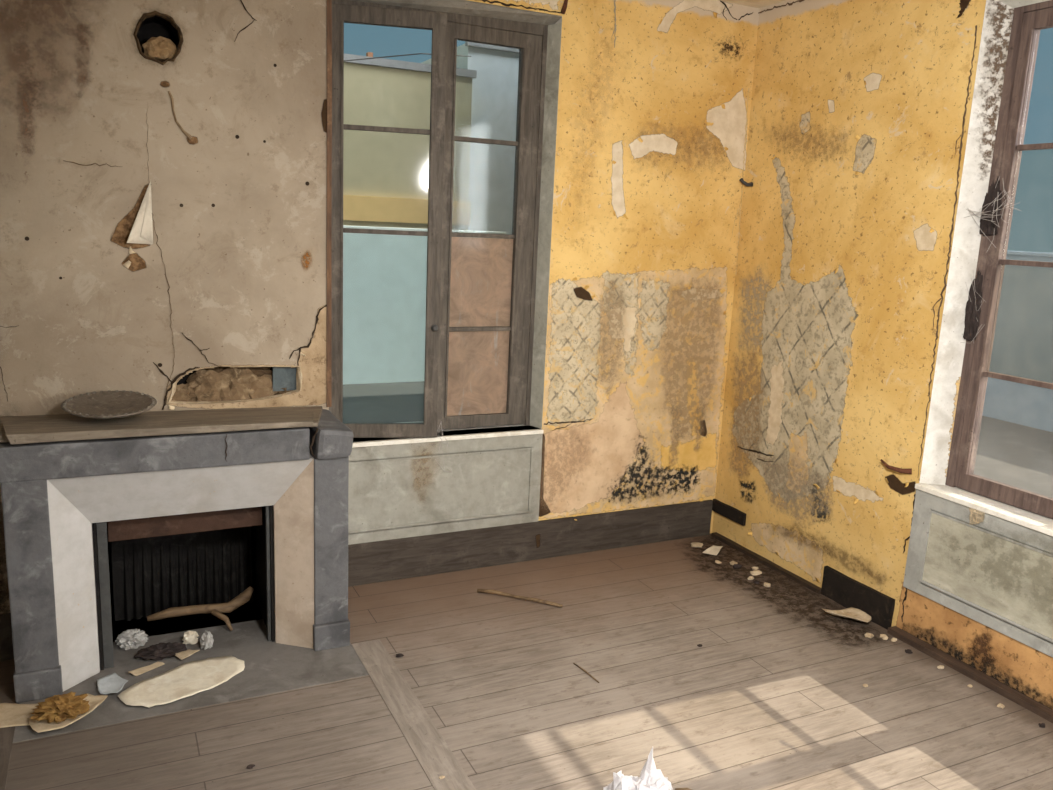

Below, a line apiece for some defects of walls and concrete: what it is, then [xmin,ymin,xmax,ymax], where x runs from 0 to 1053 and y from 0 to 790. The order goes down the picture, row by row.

crack [234,0,257,42]
water stain [0,0,88,152]
peeling [111,180,153,272]
peeling [611,134,678,219]
peeling [705,88,747,170]
peeling [981,0,1014,174]
spalling [167,305,327,410]
crack [289,305,327,366]
peeling [539,267,728,520]
water stain [609,284,719,503]
peeling [732,155,916,504]
water stain [914,628,1053,709]